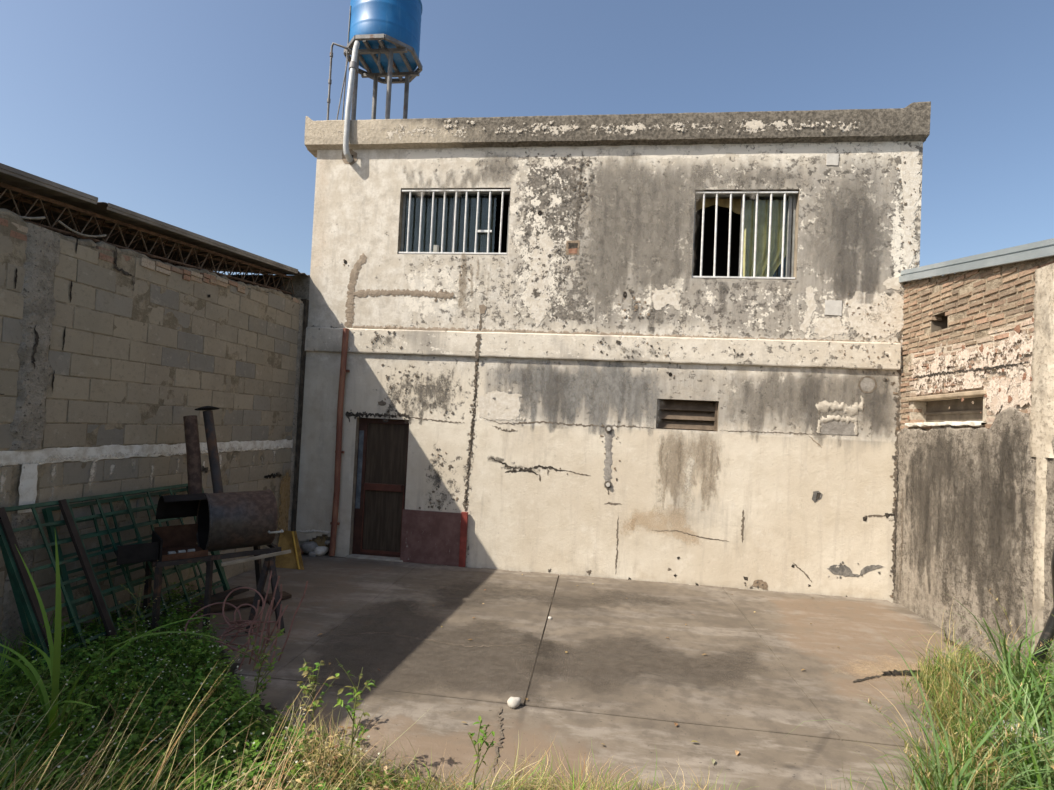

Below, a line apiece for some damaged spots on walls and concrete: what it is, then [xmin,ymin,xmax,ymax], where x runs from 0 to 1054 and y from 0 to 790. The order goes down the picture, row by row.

peeling [422,119,554,133]
peeling [783,120,864,132]
water stain [572,154,692,323]
flaking render [800,142,1034,415]
mould [381,364,455,424]
crack [345,304,653,511]
water stain [510,361,656,434]
crack [724,428,814,436]
water stain [742,369,888,438]
water stain [660,437,719,500]
water stain [905,433,1026,629]
flaking render [828,561,883,578]